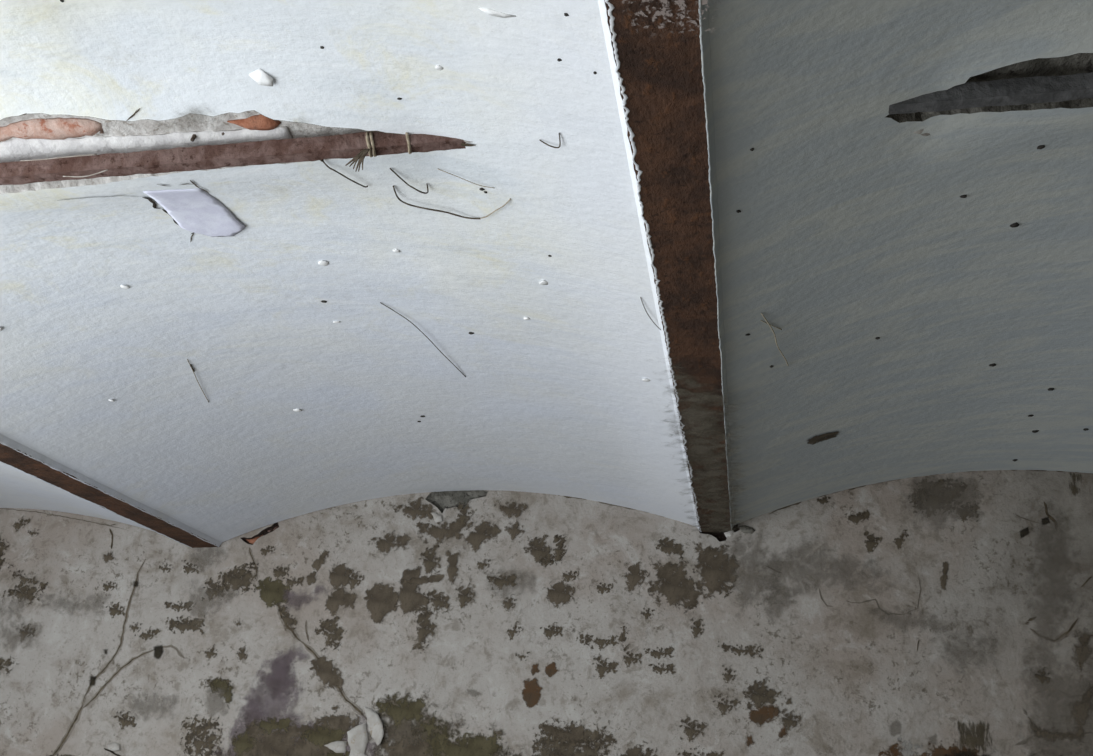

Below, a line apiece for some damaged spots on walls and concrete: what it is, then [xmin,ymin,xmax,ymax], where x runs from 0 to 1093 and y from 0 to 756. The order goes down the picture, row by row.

spalling [956,53,1093,86]
spalling [0,110,367,163]
spalling [886,98,1093,136]
spalling [0,171,184,194]
leakage [0,539,48,605]
leakage [624,537,740,638]
crack [52,559,185,756]
leakage [103,497,579,756]
leakage [540,622,676,679]
flaking render [324,707,384,756]
leakage [366,693,657,756]
leakage [878,721,992,756]